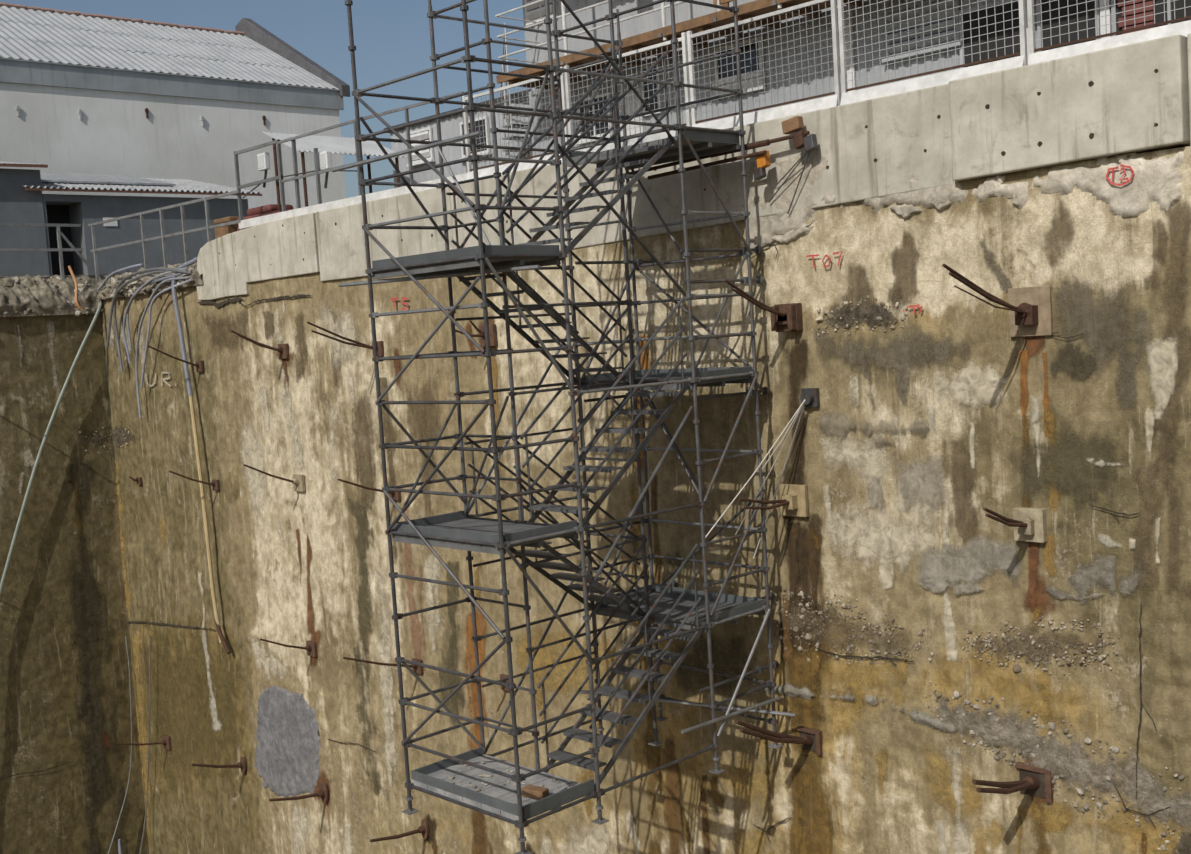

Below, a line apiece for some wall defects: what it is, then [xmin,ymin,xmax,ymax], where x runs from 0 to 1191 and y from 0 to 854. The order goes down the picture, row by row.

rust [779,340,807,500]
spalling [815,295,908,340]
water stain [889,234,917,309]
water stain [815,265,1004,408]
flaking render [741,151,1184,259]
rust [1019,336,1056,452]
water stain [1051,201,1191,595]
water stain [824,423,976,588]
rust [296,529,320,666]
rust [779,514,833,854]
spalling [770,588,936,667]
crack [1114,611,1171,828]